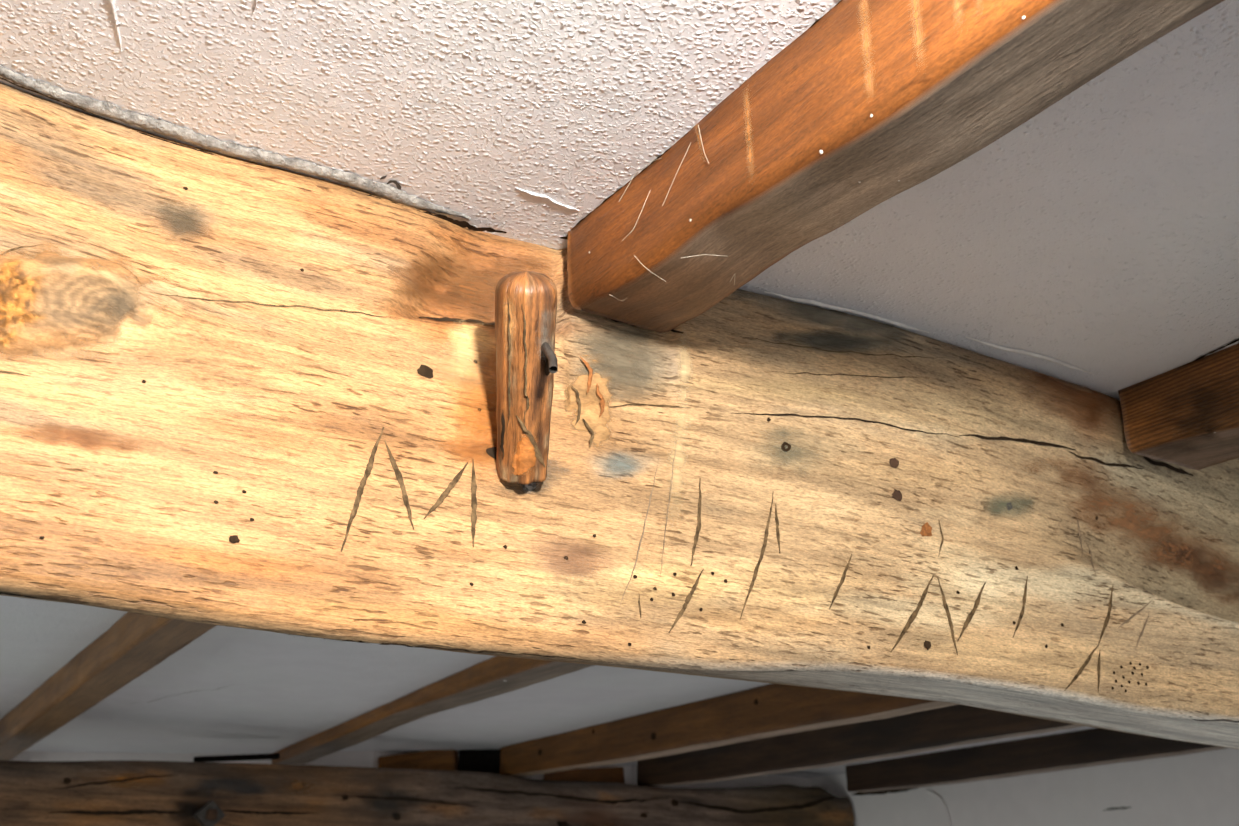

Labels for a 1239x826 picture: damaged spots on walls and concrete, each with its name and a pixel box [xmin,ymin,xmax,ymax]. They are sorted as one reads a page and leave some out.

crack [739,336,946,378]
crack [609,402,689,410]
crack [736,413,1143,469]